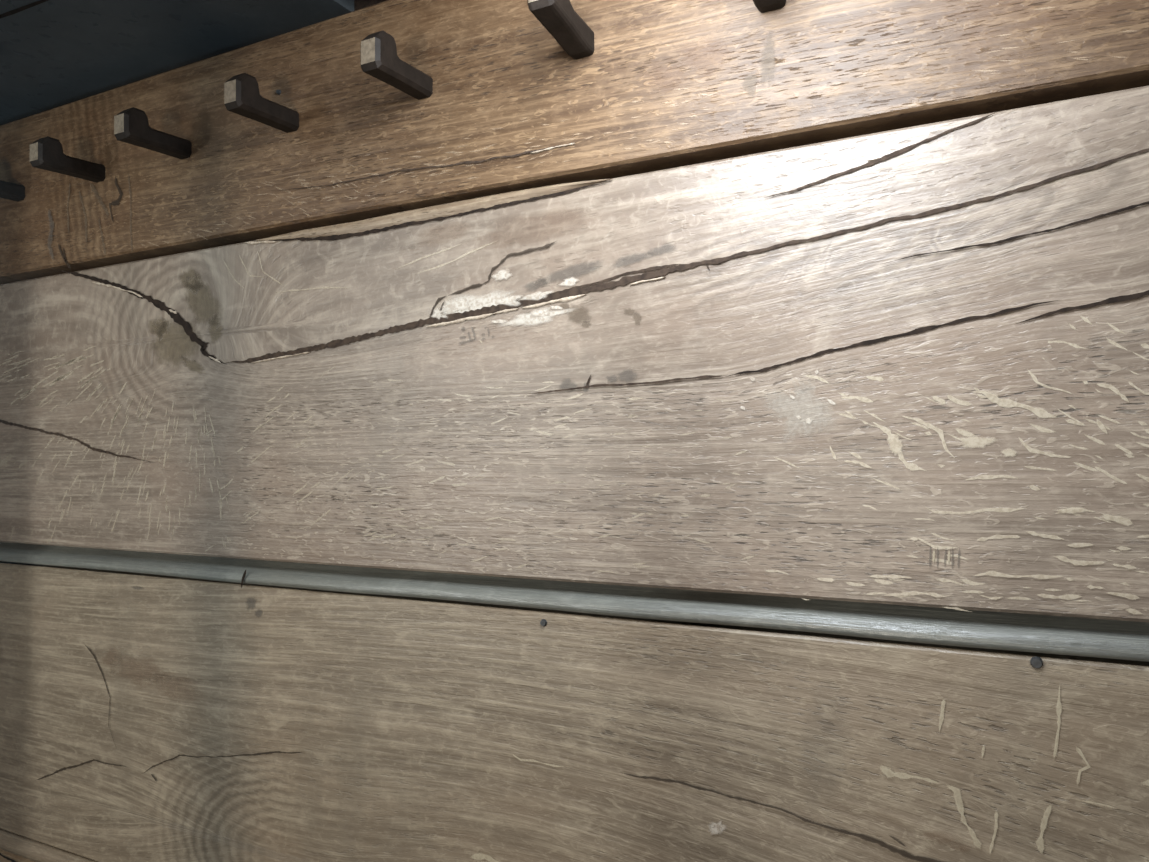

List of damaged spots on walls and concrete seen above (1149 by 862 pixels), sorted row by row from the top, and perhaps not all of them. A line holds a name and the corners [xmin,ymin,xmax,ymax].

crack [764,112,997,198]
crack [58,142,1149,364]
crack [528,290,1149,394]
crack [0,419,155,463]
crack [624,773,941,862]